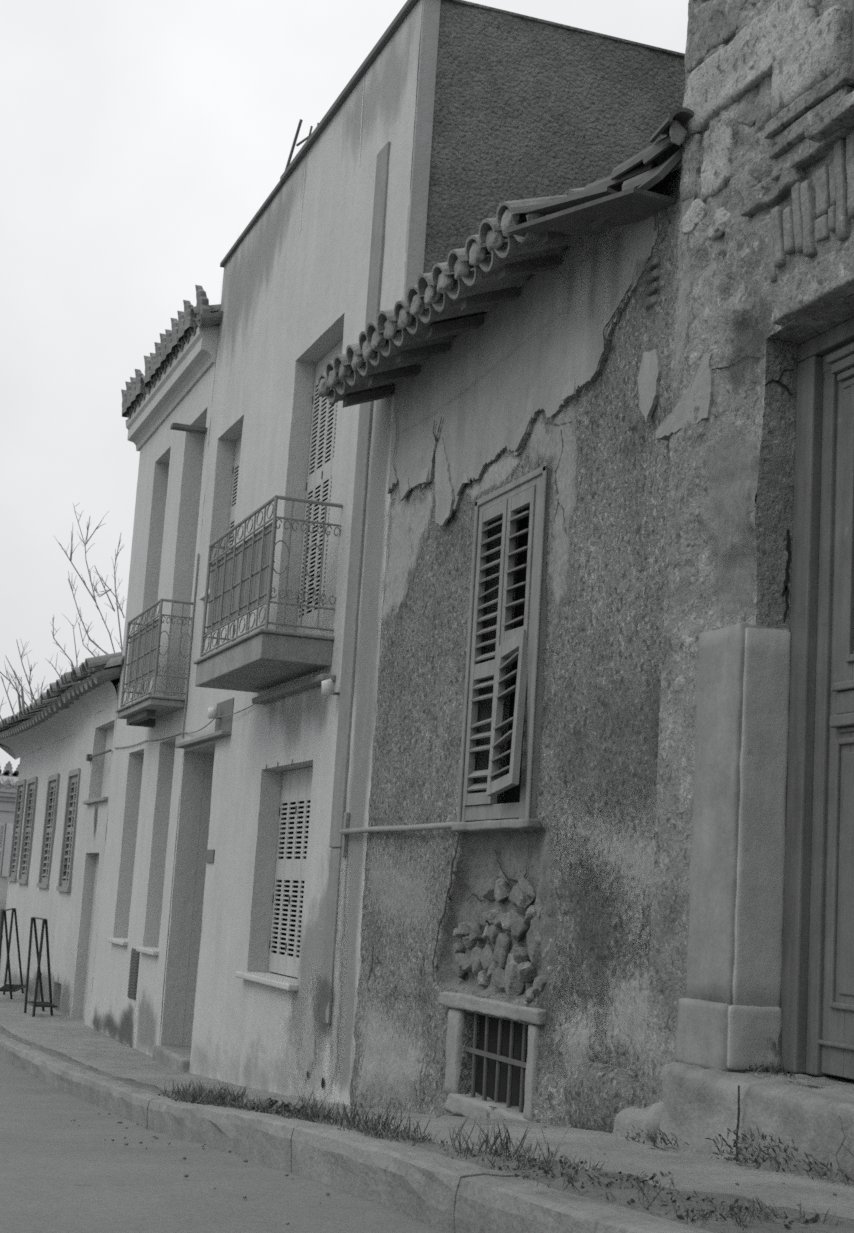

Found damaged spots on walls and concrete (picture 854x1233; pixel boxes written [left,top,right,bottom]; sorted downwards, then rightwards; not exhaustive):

peeling [637,349,714,441]
peeling [381,379,578,640]
crack [781,529,791,623]
spalling [432,829,558,1003]
leakage [93,1009,132,1047]